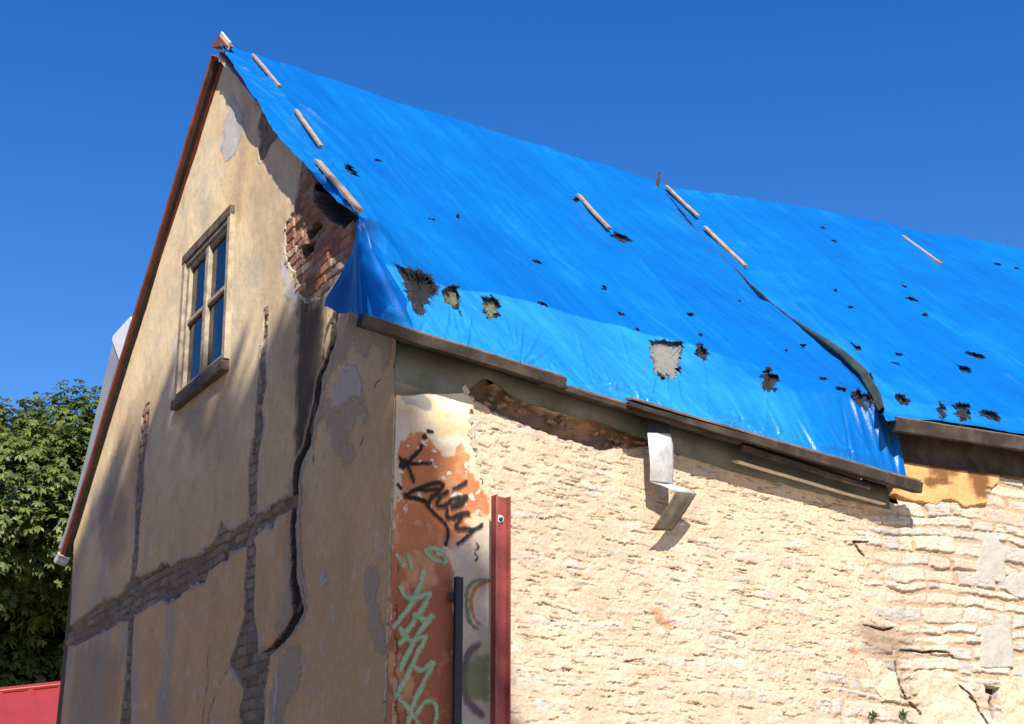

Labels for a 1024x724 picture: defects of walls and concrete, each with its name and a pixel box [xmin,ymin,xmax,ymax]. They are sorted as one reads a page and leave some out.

flaking render [220,92,245,161]
spalling [284,164,360,302]
flaking render [313,313,391,465]
spalling [66,305,302,724]
crack [271,313,339,724]
flaking render [363,379,645,724]
spalling [887,463,999,508]
crack [862,624,954,722]
crack [959,685,987,724]